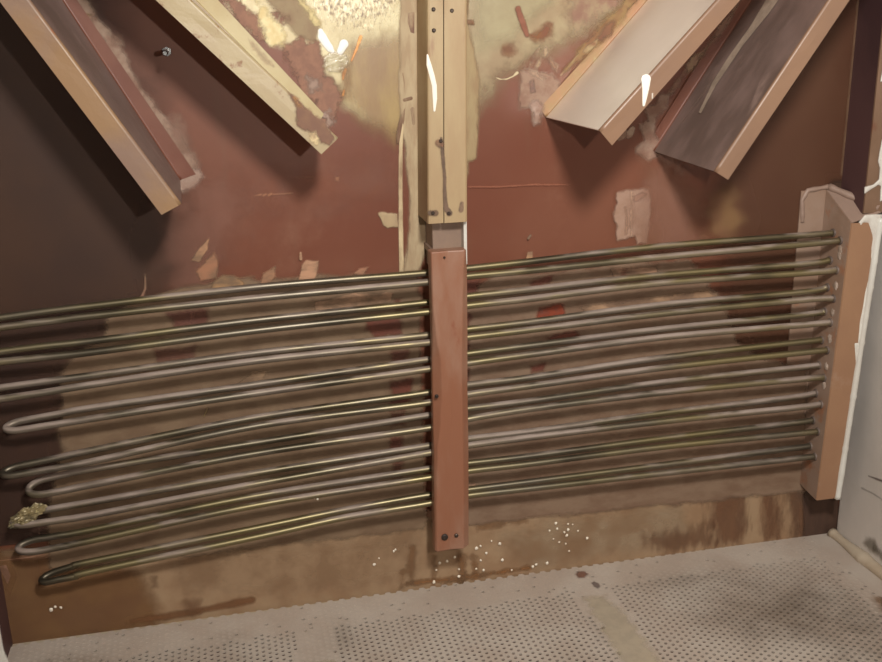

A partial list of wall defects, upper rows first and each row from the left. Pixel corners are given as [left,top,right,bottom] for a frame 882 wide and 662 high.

peeling [221,0,345,145]